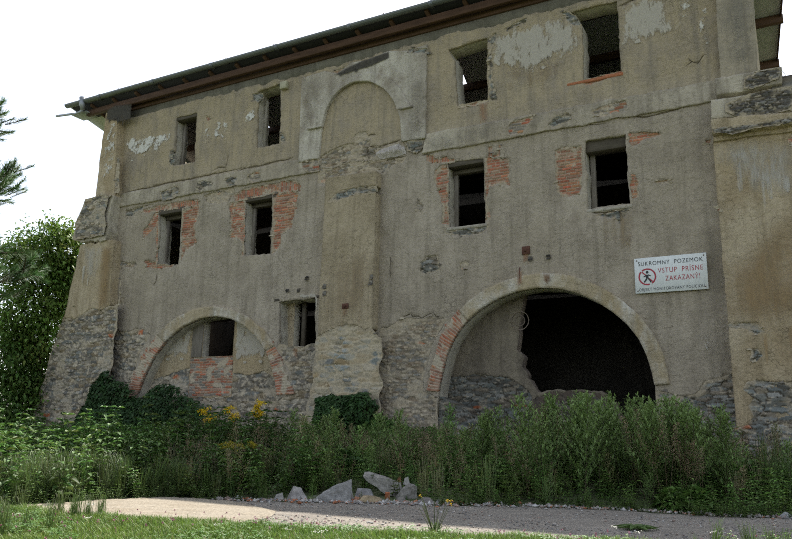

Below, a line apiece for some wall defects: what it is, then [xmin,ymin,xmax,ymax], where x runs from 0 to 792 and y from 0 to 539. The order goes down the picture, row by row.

peeling [458,10,581,109]
spalling [702,67,792,145]
spalling [74,124,121,240]
peeling [127,134,170,161]
flaking render [118,181,212,280]
flaking render [223,177,301,256]
spalling [302,132,455,225]
spalling [420,255,442,274]
flaking render [484,143,510,221]
flaking render [554,145,583,197]
spalling [597,174,640,224]